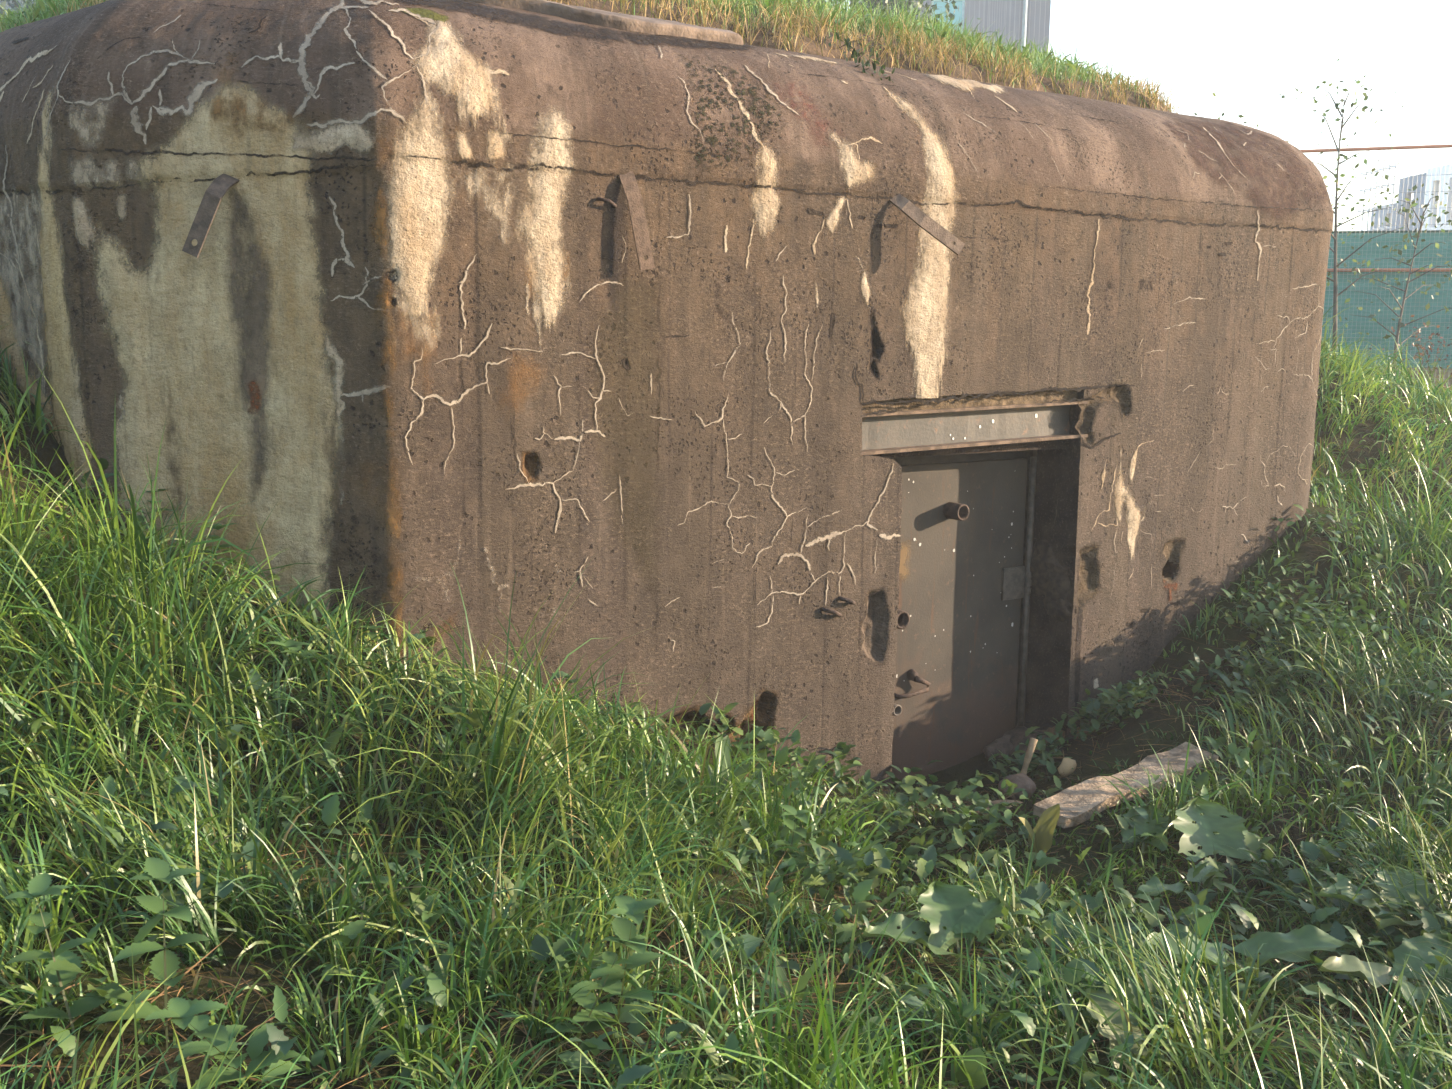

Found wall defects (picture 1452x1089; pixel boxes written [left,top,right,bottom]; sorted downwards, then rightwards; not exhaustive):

crack [0,0,440,268]
water stain [387,0,848,349]
crack [666,195,692,239]
water stain [884,67,1017,398]
crack [959,112,1064,184]
water stain [0,45,385,620]
spalling [522,451,540,482]
crack [340,236,901,652]
spalling [1075,384,1133,447]
water stain [1092,440,1154,578]
spalling [1162,539,1186,584]
spalling [665,692,777,757]